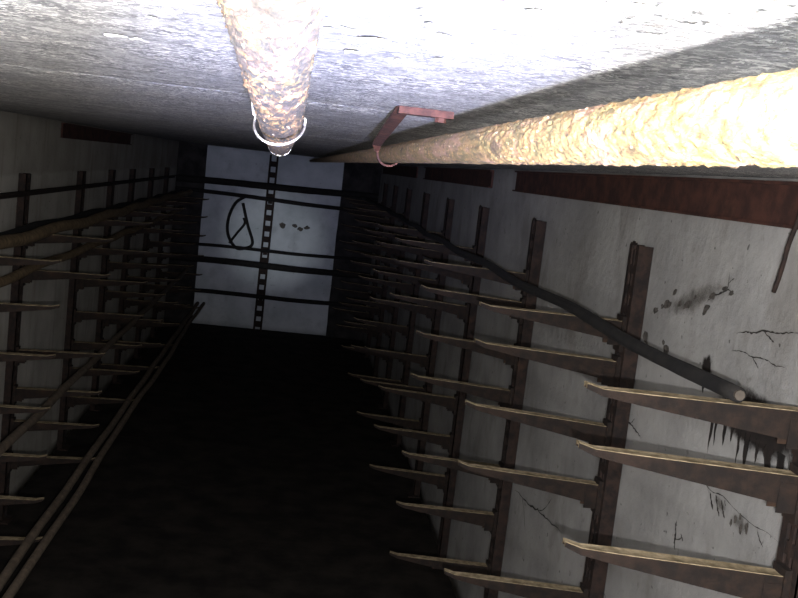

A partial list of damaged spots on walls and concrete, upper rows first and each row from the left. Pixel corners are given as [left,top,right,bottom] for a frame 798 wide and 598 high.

crack [732,330,794,368]
water stain [744,390,767,404]
water stain [707,422,792,469]